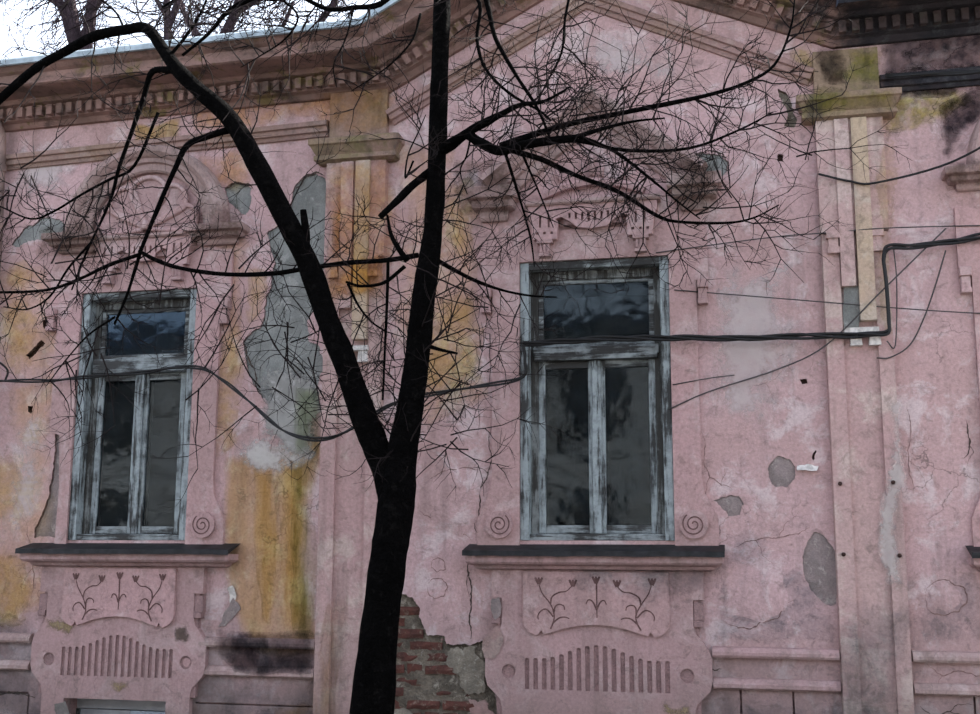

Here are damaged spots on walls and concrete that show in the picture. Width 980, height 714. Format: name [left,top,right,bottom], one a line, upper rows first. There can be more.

flaking render [291,174,326,270]
flaking render [244,226,323,405]
flaking render [34,434,59,538]
leakage [247,369,321,470]
crack [427,558,472,636]
flaking render [713,495,744,516]
crack [736,513,807,562]
flaking render [768,450,819,487]
flaking render [802,532,837,606]
crack [907,410,926,494]
crack [964,421,974,465]
flaking render [394,594,497,714]